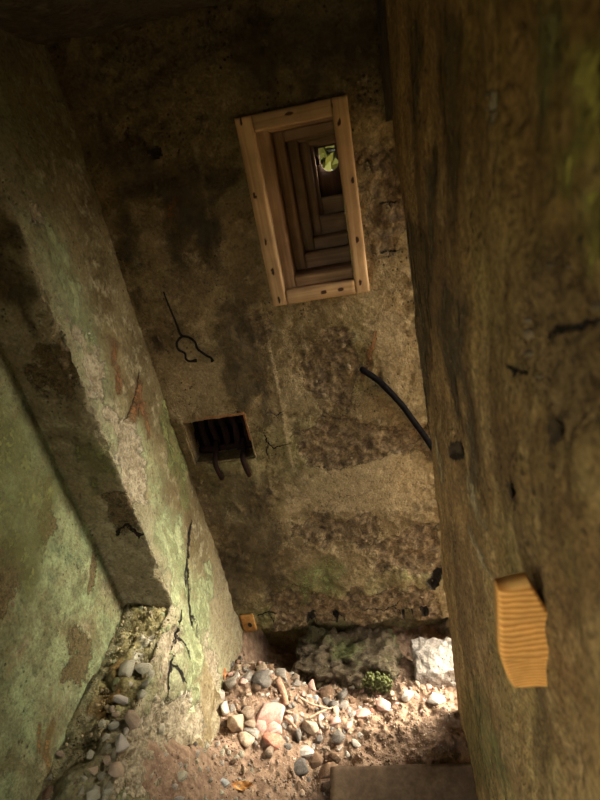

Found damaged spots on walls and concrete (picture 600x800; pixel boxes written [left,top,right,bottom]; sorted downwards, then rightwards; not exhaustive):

corrosion [183,412,251,440]
crack [115,523,144,539]
crack [164,519,199,702]